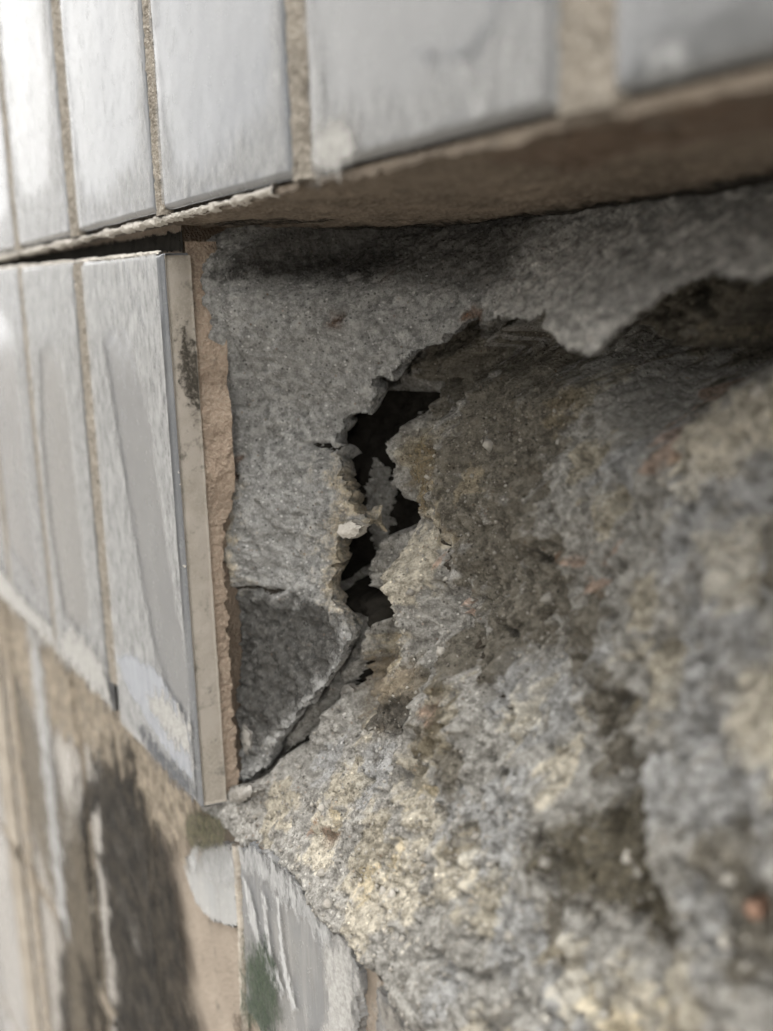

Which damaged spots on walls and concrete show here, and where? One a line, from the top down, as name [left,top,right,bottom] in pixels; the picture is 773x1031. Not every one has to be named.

crack [314,390,453,628]
crack [236,585,285,595]
spalling [183,182,773,1031]
crack [355,661,375,684]
crack [252,735,310,783]